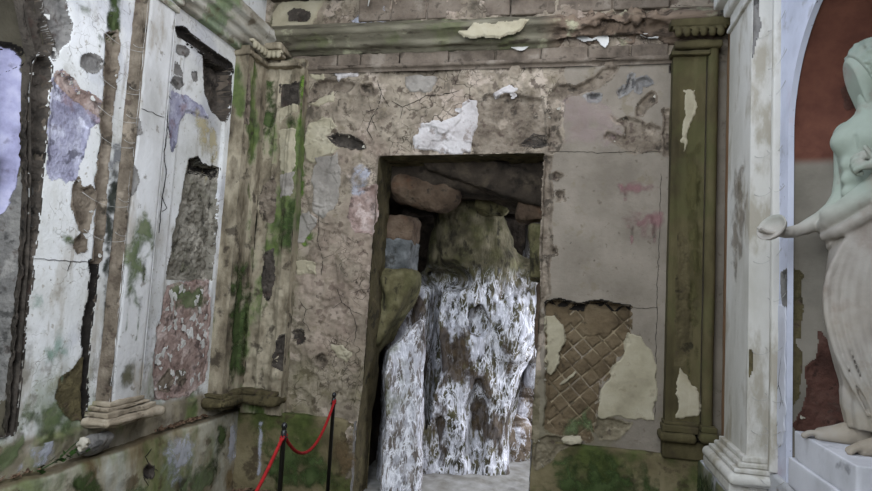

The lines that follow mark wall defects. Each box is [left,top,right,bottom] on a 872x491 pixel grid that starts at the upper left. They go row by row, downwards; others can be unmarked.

spalling [0,0,144,437]
peeling [152,155,221,400]
spalling [169,25,234,152]
spalling [327,132,367,150]
crack [367,81,457,140]
spalling [471,65,672,471]
spalling [780,268,844,431]